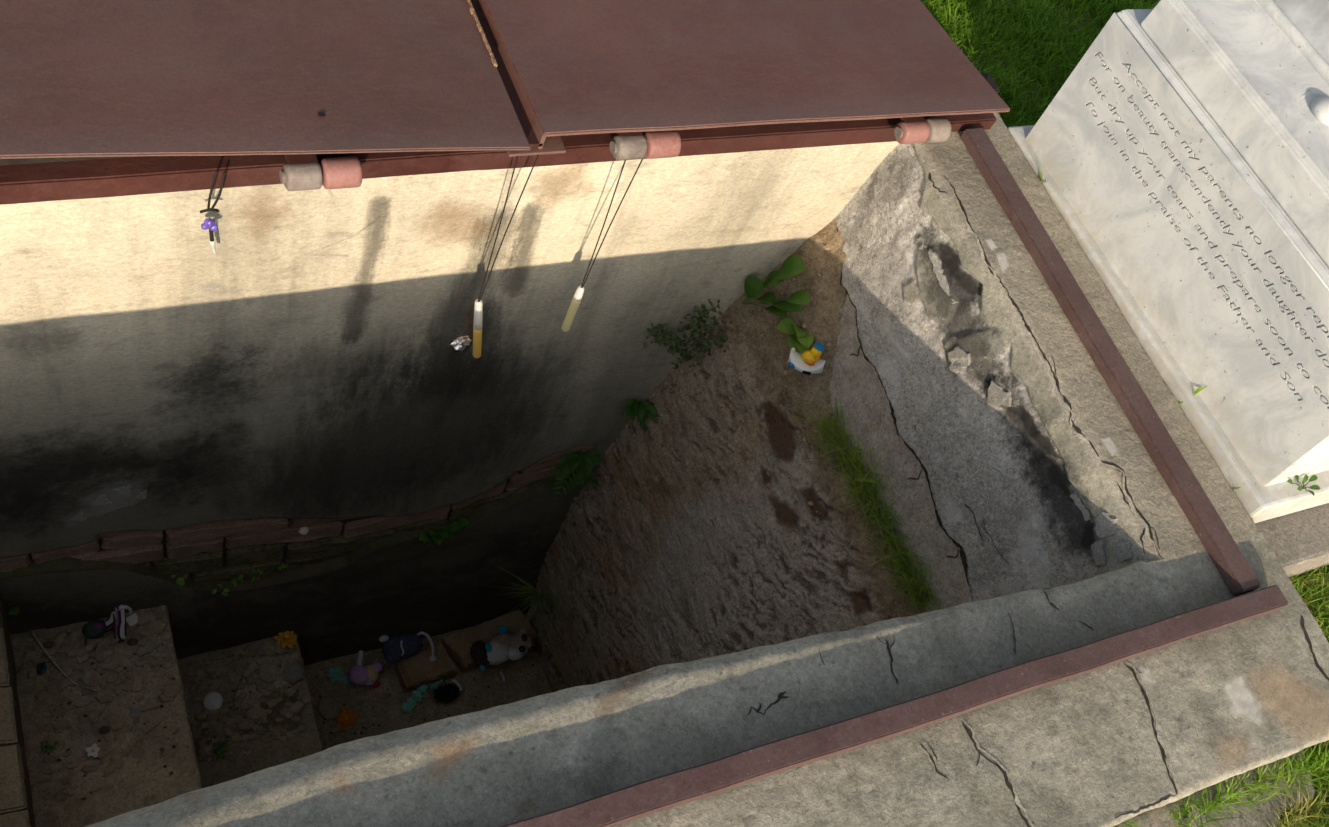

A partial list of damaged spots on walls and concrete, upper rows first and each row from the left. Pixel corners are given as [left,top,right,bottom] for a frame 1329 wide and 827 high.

spalling [915,235,950,296]
crack [837,228,1009,592]
spalling [948,346,971,367]
spalling [987,379,1012,407]
crack [928,172,1162,559]
damp [0,434,216,531]
flaking render [0,444,596,582]
crack [748,691,789,715]
crack [876,635,898,684]
crack [920,721,1036,827]
crack [1115,660,1192,827]
crack [1300,616,1329,680]